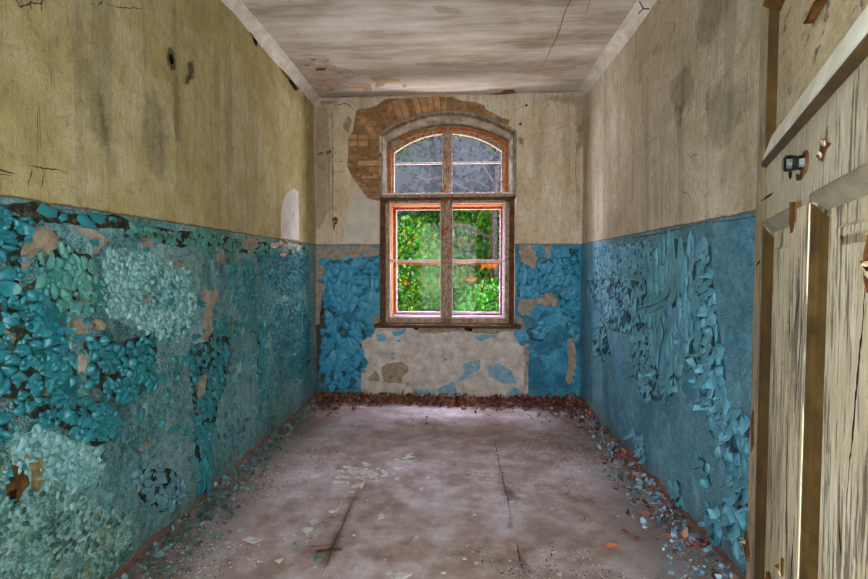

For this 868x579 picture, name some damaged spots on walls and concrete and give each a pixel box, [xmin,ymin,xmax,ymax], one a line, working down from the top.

crack [16,0,43,11]
crack [535,0,590,71]
spalling [280,54,509,201]
crack [495,440,514,521]
crack [312,497,355,578]